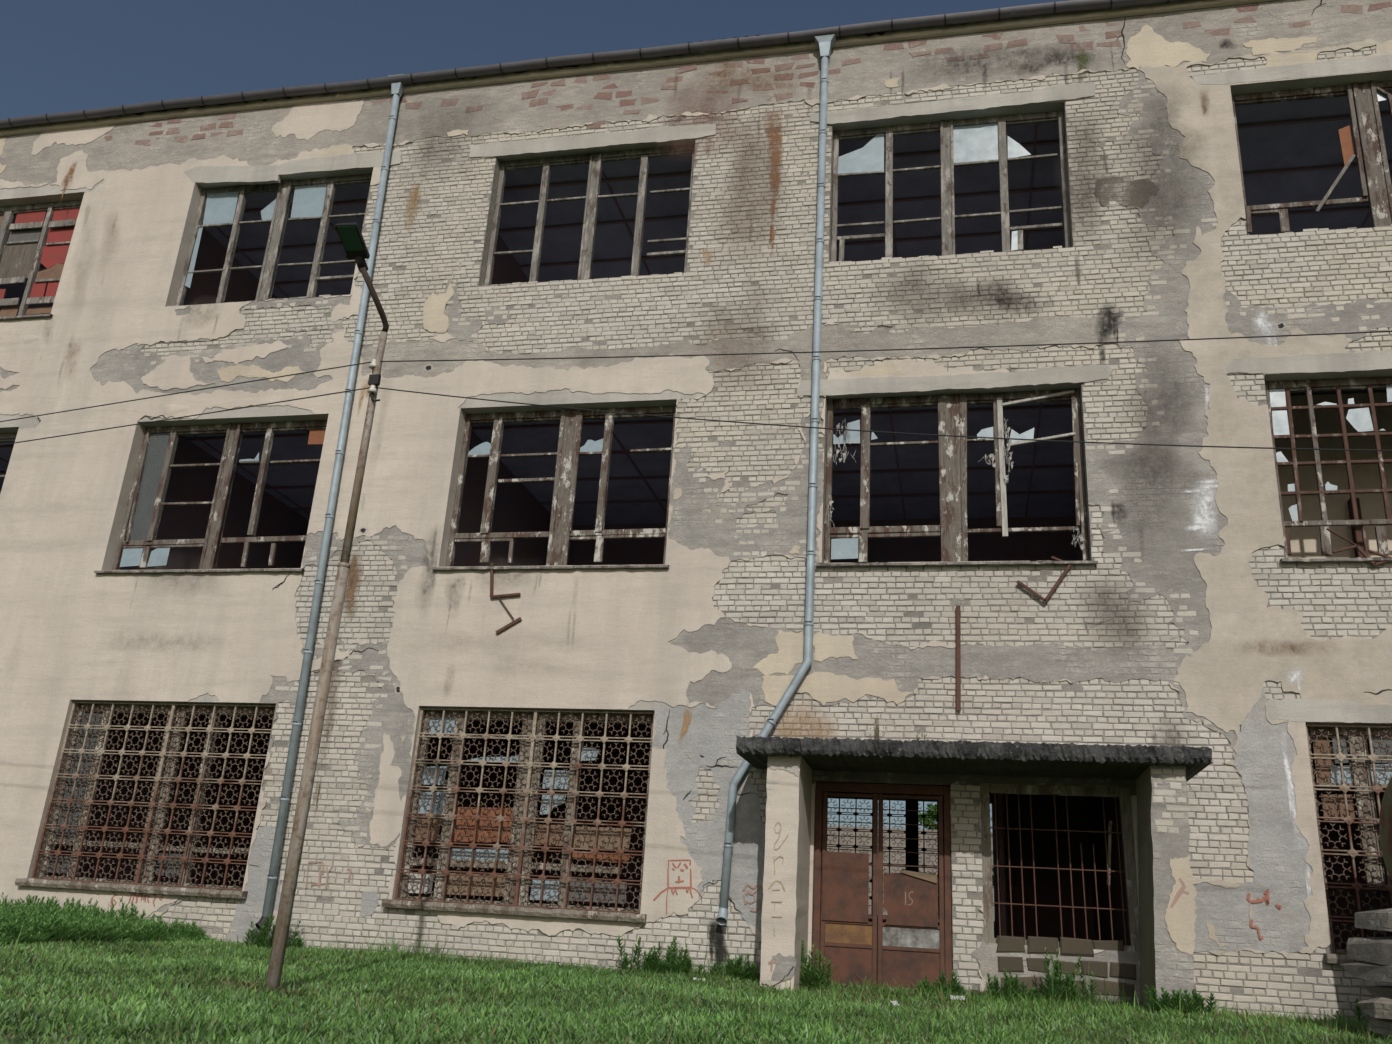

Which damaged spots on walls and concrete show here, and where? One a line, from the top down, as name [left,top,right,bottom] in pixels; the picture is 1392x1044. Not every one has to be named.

peeling [565,49,821,77]
corrosion [767,118,782,247]
leakage [1100,308,1120,360]
flaking render [0,74,821,735]
flaking render [767,0,1392,884]
leakage [1184,480,1218,551]
corrosion [345,558,359,611]
flaking render [258,525,801,990]